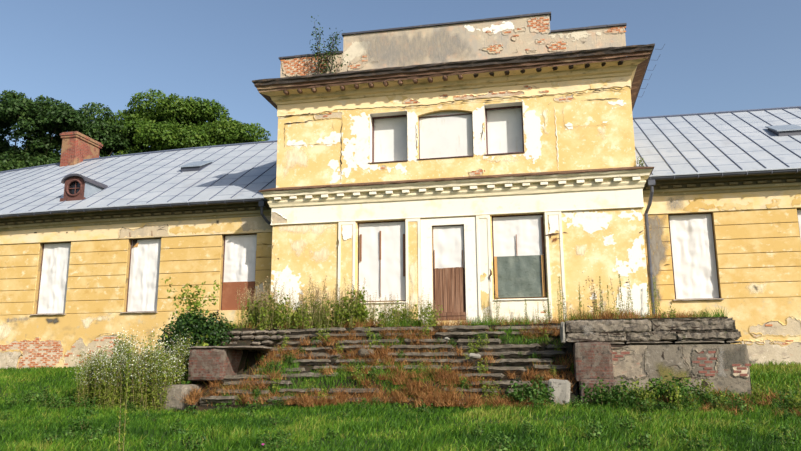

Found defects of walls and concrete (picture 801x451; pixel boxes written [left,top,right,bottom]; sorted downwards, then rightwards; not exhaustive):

spalling [464,16,626,55]
crack [280,111,342,181]
peeling [285,82,574,184]
peeling [548,209,642,246]
peeling [683,197,754,212]
peeling [255,265,305,310]
peeling [590,234,650,318]
spalling [0,317,120,369]
flaking render [731,316,801,379]